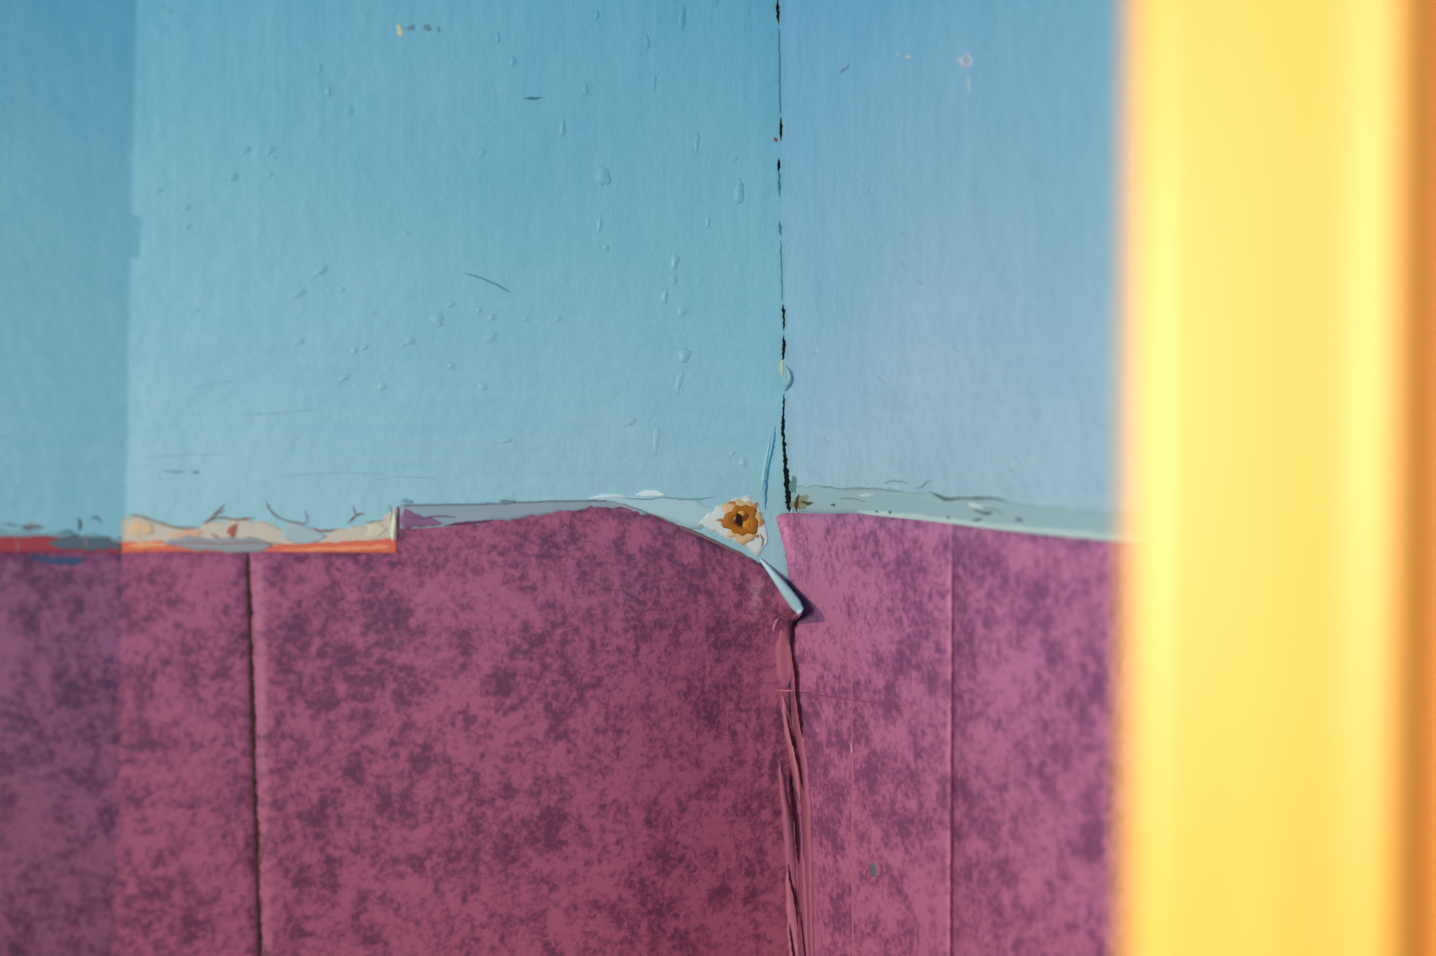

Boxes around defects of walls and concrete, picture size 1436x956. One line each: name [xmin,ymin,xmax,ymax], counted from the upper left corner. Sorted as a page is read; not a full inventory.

crack [760,0,1005,557]
spalling [697,495,768,556]
corrosion [716,499,764,545]